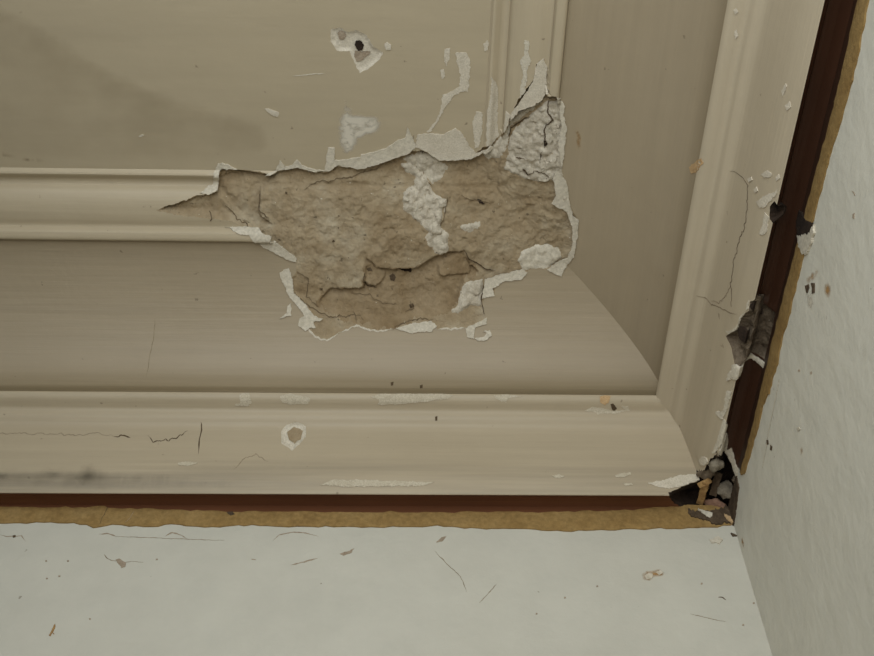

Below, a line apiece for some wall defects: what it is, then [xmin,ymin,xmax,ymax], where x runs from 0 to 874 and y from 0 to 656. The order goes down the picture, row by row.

flaking render [330,28,391,73]
flaking render [157,40,579,341]
crack [698,173,748,314]
peeling [726,0,870,475]
crack [0,423,202,454]
peeling [0,390,740,532]